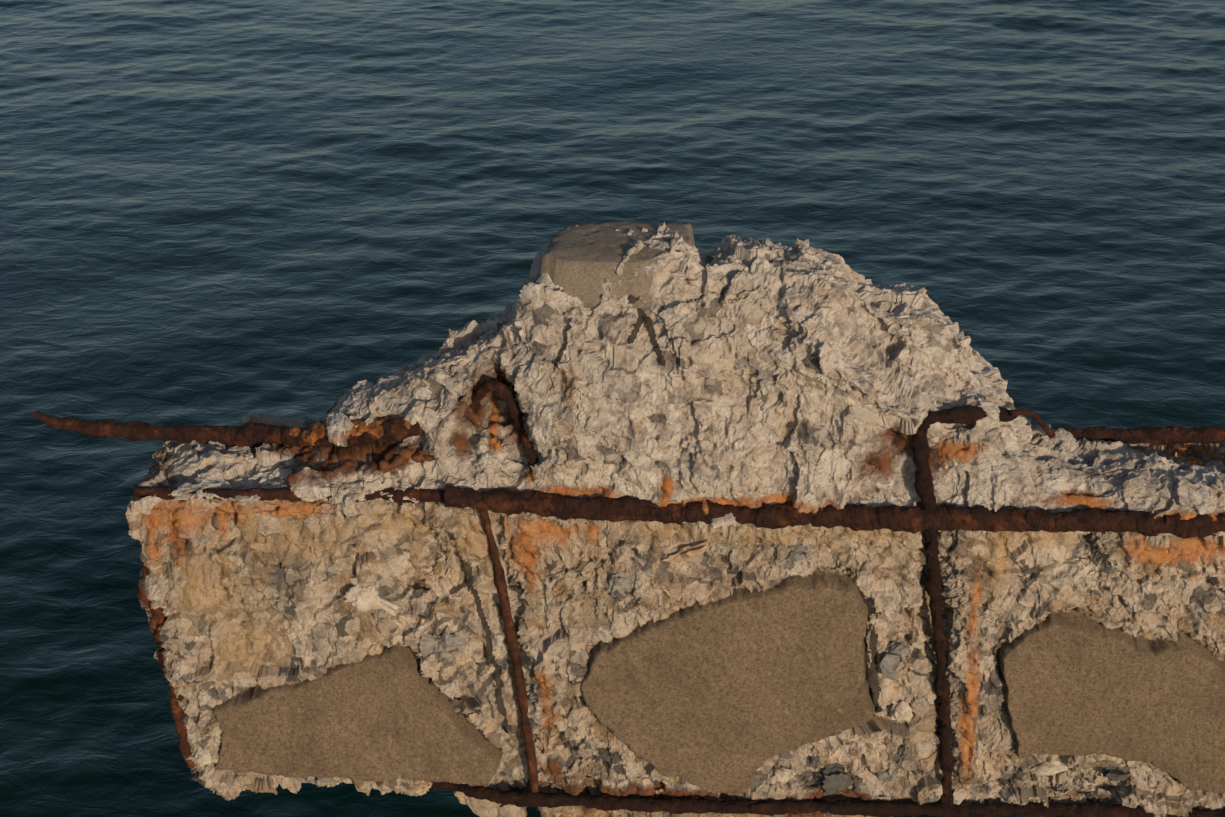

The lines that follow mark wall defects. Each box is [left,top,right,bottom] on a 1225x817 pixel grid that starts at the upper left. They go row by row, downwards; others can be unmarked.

corrosion [449,364,535,457]
corrosion [272,416,433,485]
corrosion [143,500,204,557]
corrosion [524,467,616,498]
corrosion [660,475,674,508]
corrosion [689,494,834,514]
corrosion [1054,491,1112,508]
corrosion [1123,538,1225,566]
corrosion [136,579,164,671]
spalling [125,441,1225,817]
corrosion [959,658,978,771]
corrosion [538,760,729,813]